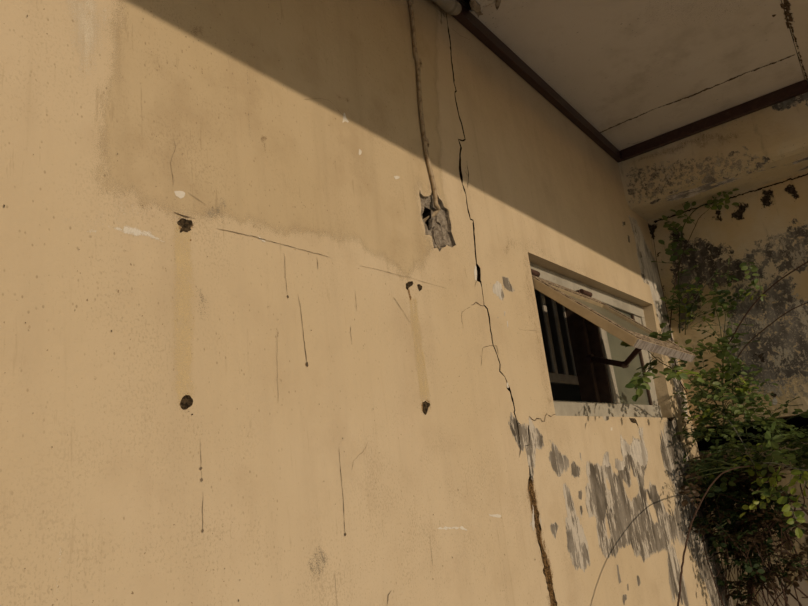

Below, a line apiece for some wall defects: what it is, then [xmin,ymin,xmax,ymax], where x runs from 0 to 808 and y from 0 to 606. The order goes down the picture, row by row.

spalling [419,192,456,251]
crack [441,13,555,425]
leakage [712,202,749,221]
leakage [760,189,774,208]
leakage [784,184,800,199]
peeling [493,276,514,300]
peeling [622,215,808,402]
peeling [508,357,734,606]
crack [526,458,558,606]
peeling [759,577,808,606]